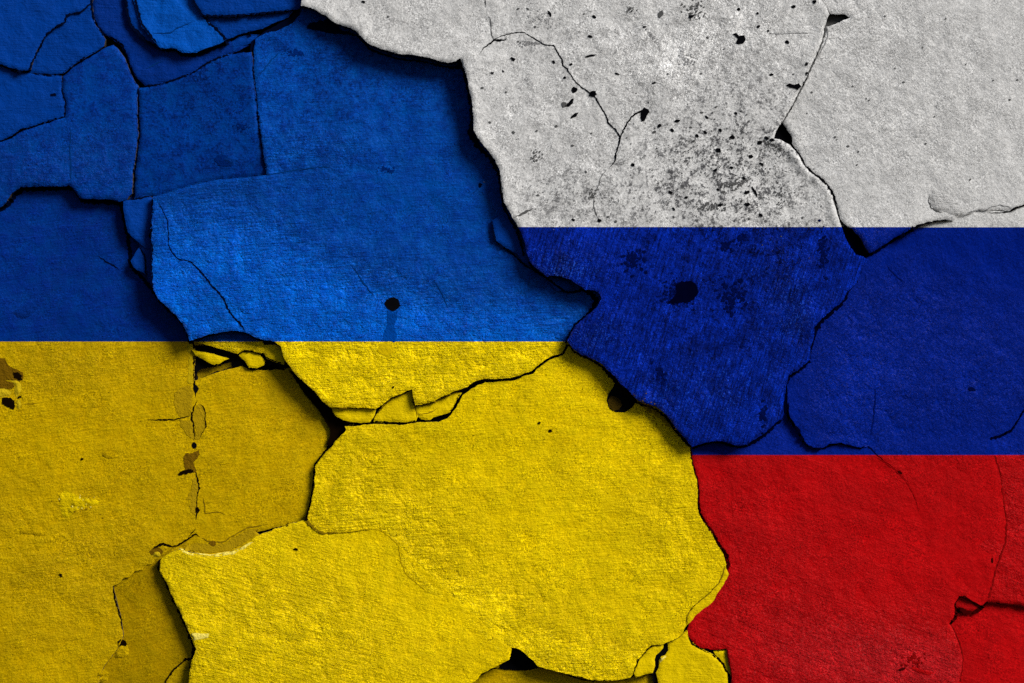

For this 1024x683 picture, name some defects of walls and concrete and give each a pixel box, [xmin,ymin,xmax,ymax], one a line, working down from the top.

crack [113,589,122,626]
crack [0,0,331,439]
crack [152,468,266,683]
flaking render [0,187,462,683]
crack [305,0,1024,682]